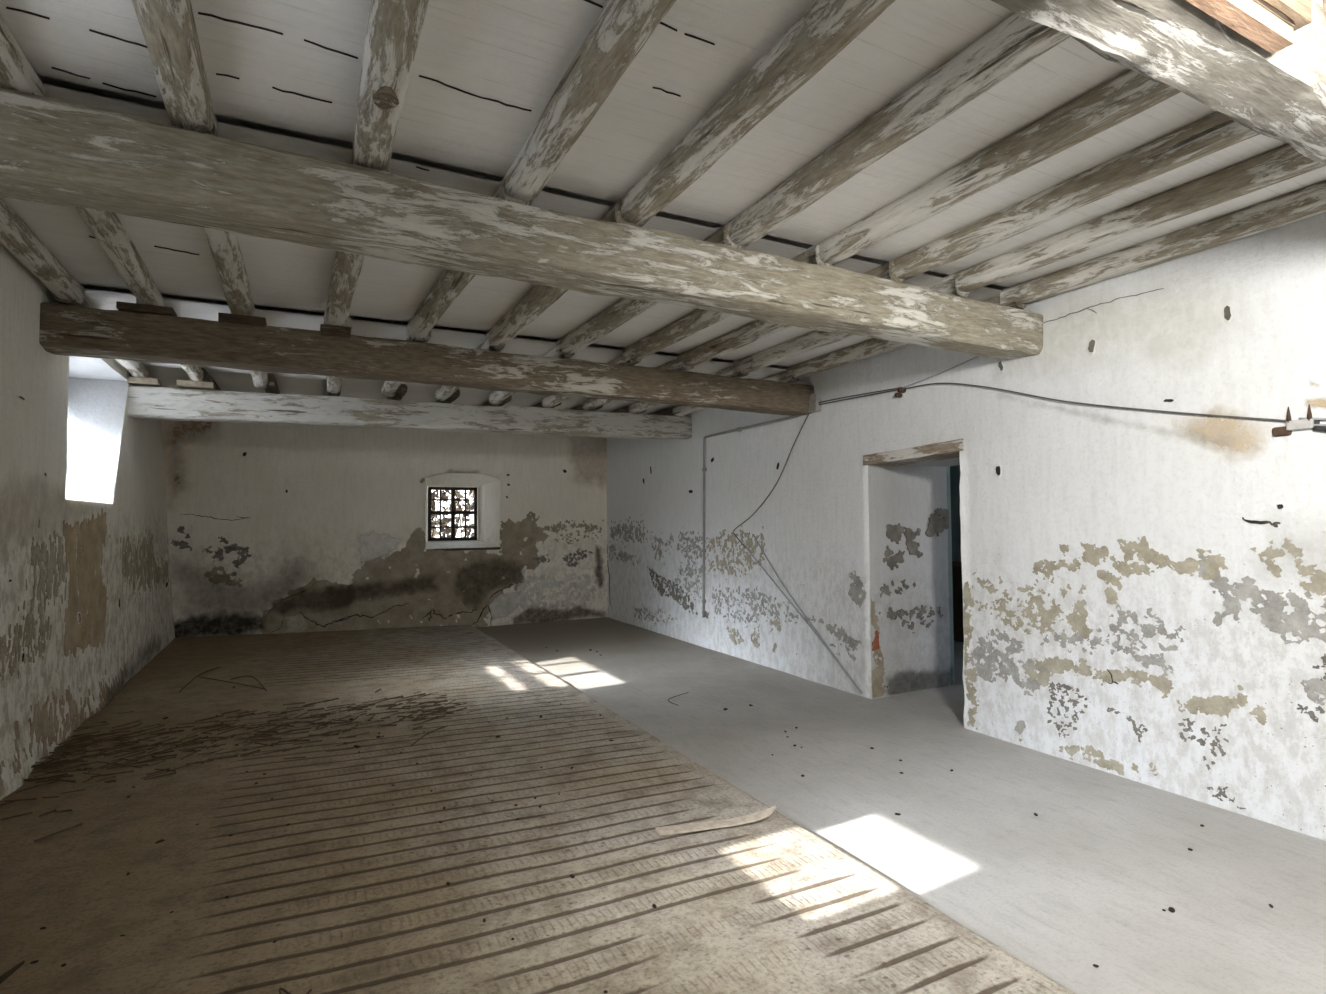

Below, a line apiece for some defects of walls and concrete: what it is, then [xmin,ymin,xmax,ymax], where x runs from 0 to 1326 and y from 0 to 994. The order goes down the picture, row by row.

water stain [595,547,603,586]
flaking render [0,508,252,681]
water stain [174,614,264,638]
water stain [278,578,434,614]
water stain [514,607,603,624]
flaking render [261,508,949,698]
flaking render [963,503,1326,776]
flaking render [0,657,127,797]
flaking render [1206,786,1246,809]